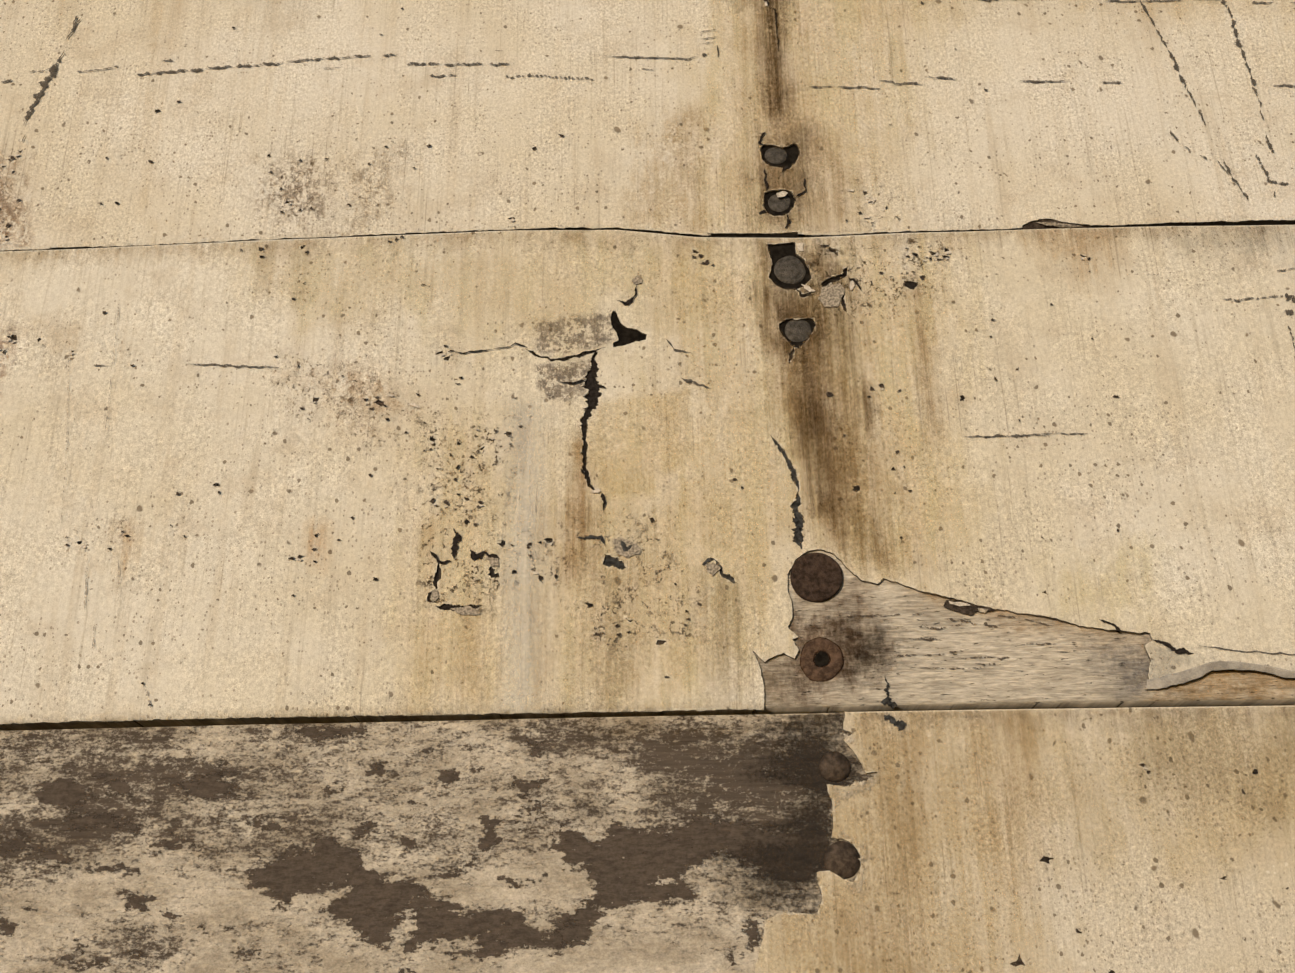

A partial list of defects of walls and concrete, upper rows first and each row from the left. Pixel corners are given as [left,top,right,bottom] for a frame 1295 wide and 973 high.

crack [458,275,646,570]
crack [773,439,805,549]
corrosion [798,620,879,674]
peeling [1146,661,1295,689]
peeling [295,724,368,742]
peeling [176,757,241,802]
peeling [358,758,395,778]
peeling [418,747,485,793]
peeling [0,769,209,922]
peeling [226,775,871,973]
peeling [0,901,37,937]
peeling [57,938,110,973]